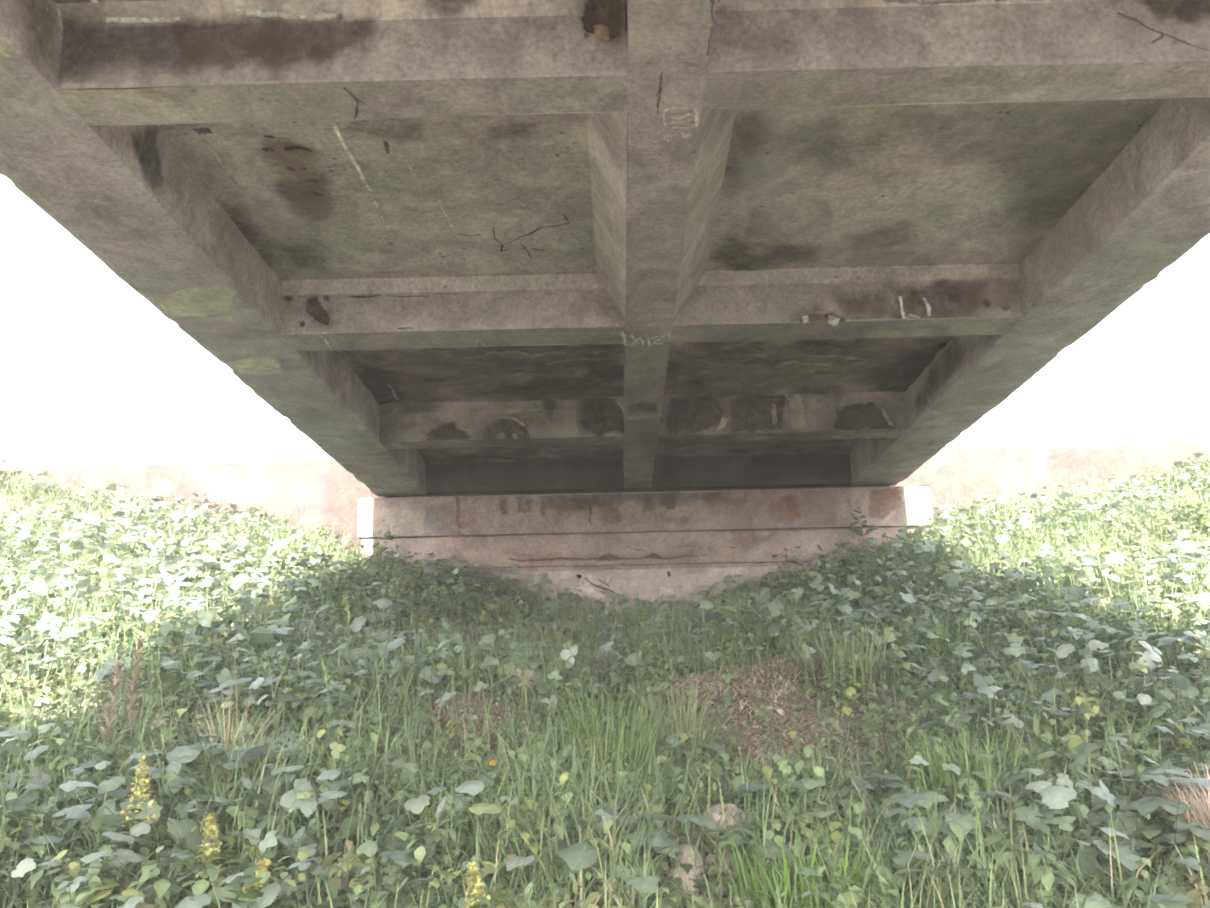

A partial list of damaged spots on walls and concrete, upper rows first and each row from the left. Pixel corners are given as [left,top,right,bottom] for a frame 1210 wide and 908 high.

damp [54,0,368,74]
spalling [571,0,625,48]
crack [707,0,720,56]
crack [890,0,970,8]
crack [1117,13,1210,51]
damp [1145,0,1210,20]
crack [456,214,569,260]
spalling [421,413,539,440]
spalling [569,396,663,436]
spalling [827,397,900,430]